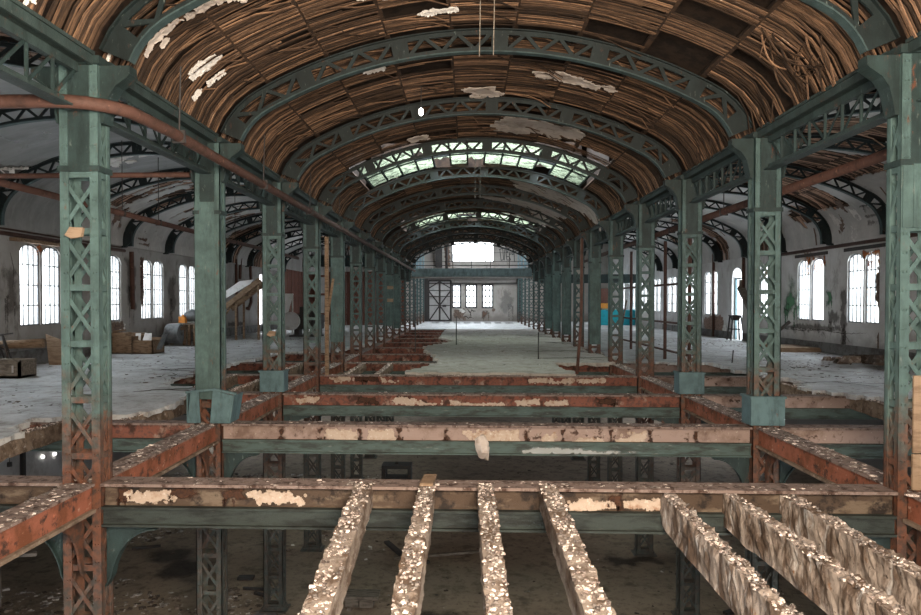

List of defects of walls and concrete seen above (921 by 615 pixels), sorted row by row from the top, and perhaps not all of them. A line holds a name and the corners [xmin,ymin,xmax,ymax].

flaking render [144,0,247,58]
flaking render [188,54,226,102]
flaking render [532,71,618,93]
flaking render [490,116,586,141]
corrosion [355,377,379,385]
corrosion [356,396,379,406]
peeling [124,489,177,504]
peeling [246,489,307,507]